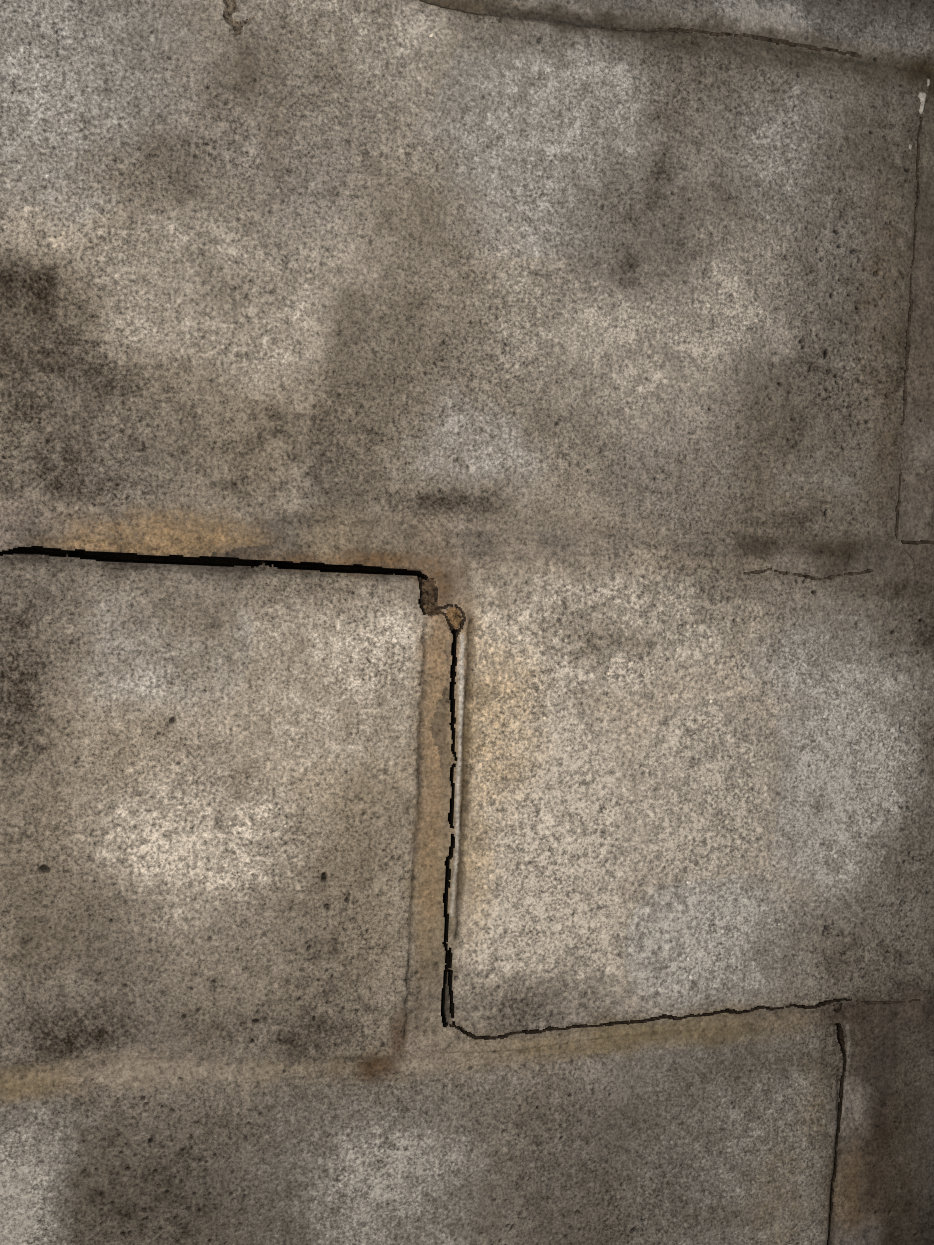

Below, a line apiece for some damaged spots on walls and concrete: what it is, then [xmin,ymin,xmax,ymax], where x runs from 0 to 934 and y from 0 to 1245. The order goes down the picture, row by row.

spalling [223,0,255,36]
crack [895,116,934,545]
crack [0,546,934,1245]